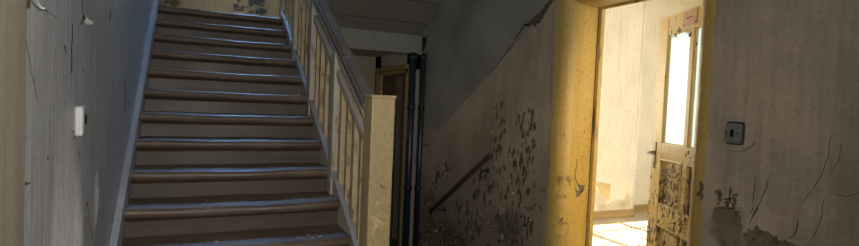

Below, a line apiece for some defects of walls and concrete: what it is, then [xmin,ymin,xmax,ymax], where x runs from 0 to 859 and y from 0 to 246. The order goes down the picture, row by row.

crack [31,0,83,73]
peeling [233,0,267,15]
flaking render [648,164,795,246]
crack [785,137,858,246]